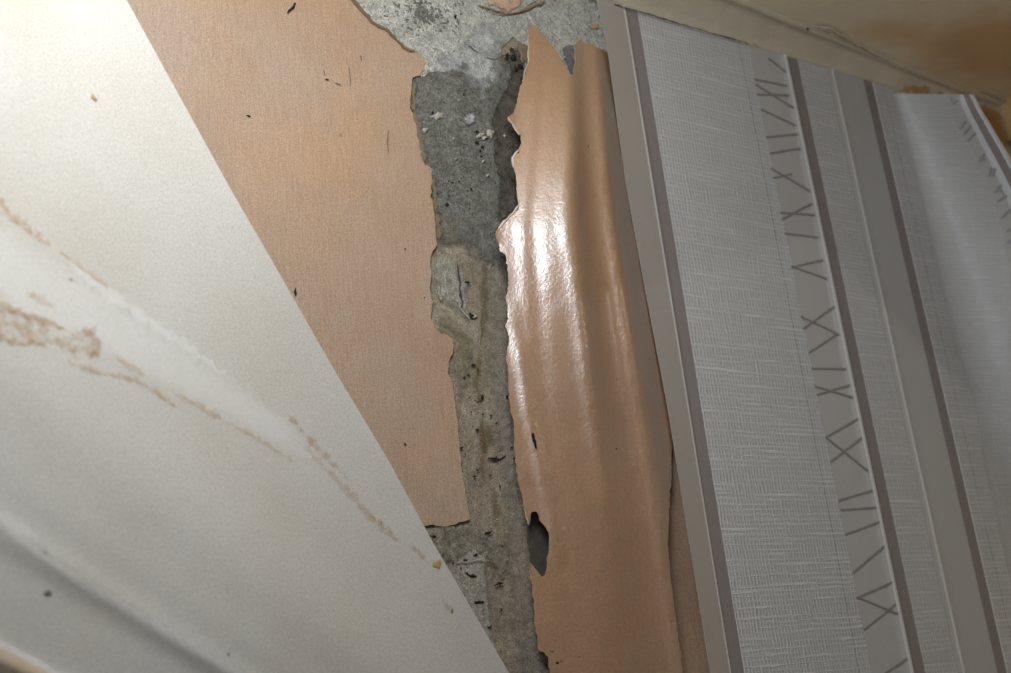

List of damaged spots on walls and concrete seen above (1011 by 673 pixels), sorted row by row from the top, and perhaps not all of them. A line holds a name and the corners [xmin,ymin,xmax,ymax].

peeling [127,0,710,673]